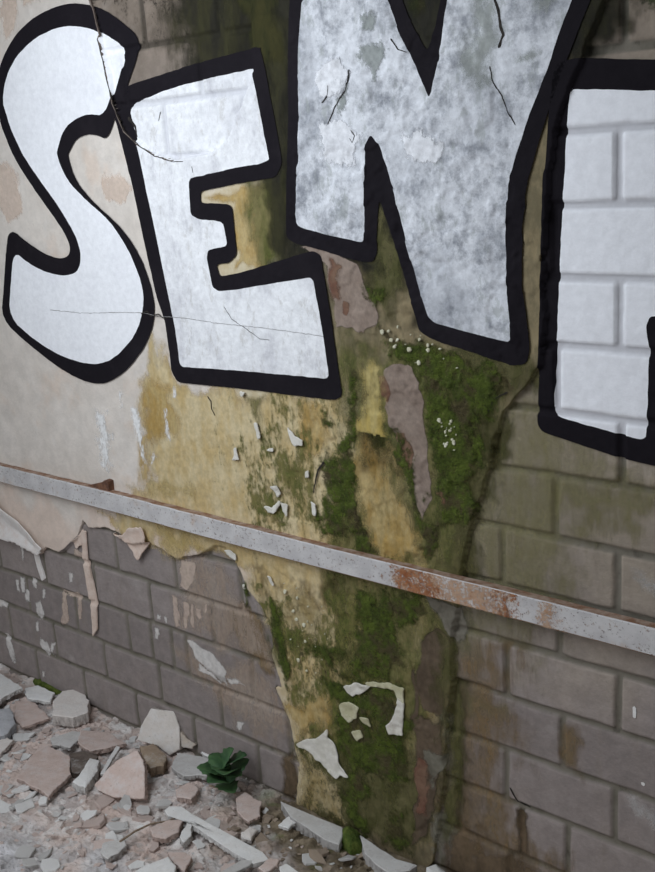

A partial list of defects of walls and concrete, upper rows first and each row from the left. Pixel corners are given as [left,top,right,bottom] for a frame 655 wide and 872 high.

spalling [89,0,197,161]
crack [97,39,193,172]
water stain [153,0,309,268]
crack [489,0,515,124]
water stain [119,334,421,563]
peeling [379,364,451,518]
spalling [59,750,155,861]
spalling [0,508,348,831]
water stain [110,513,418,850]
peeling [339,629,446,845]
rust [381,564,521,621]
water stain [426,630,551,872]